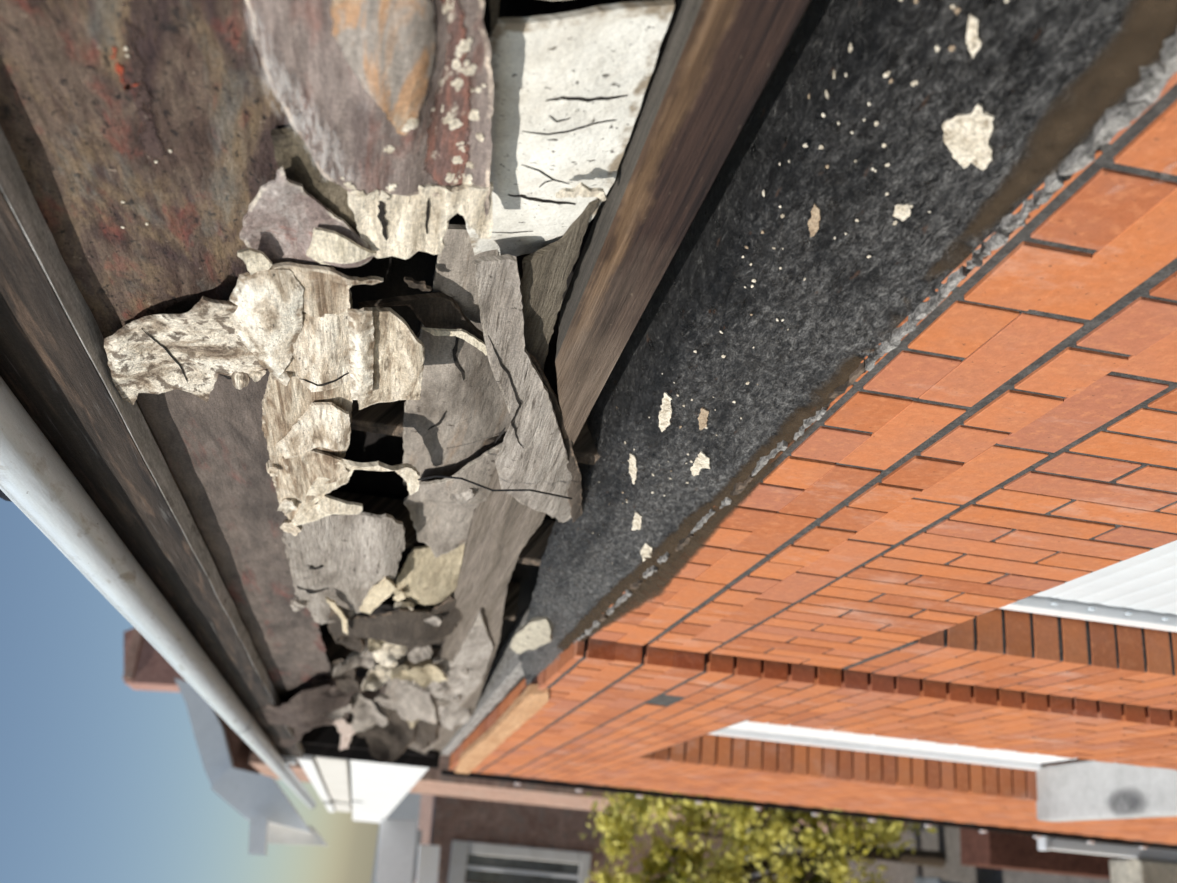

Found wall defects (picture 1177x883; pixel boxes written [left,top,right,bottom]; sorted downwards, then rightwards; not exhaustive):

crack [522,95,628,135]
peeling [239,166,377,268]
crack [508,165,576,205]
peeling [104,296,267,405]
spalling [573,31,1177,644]